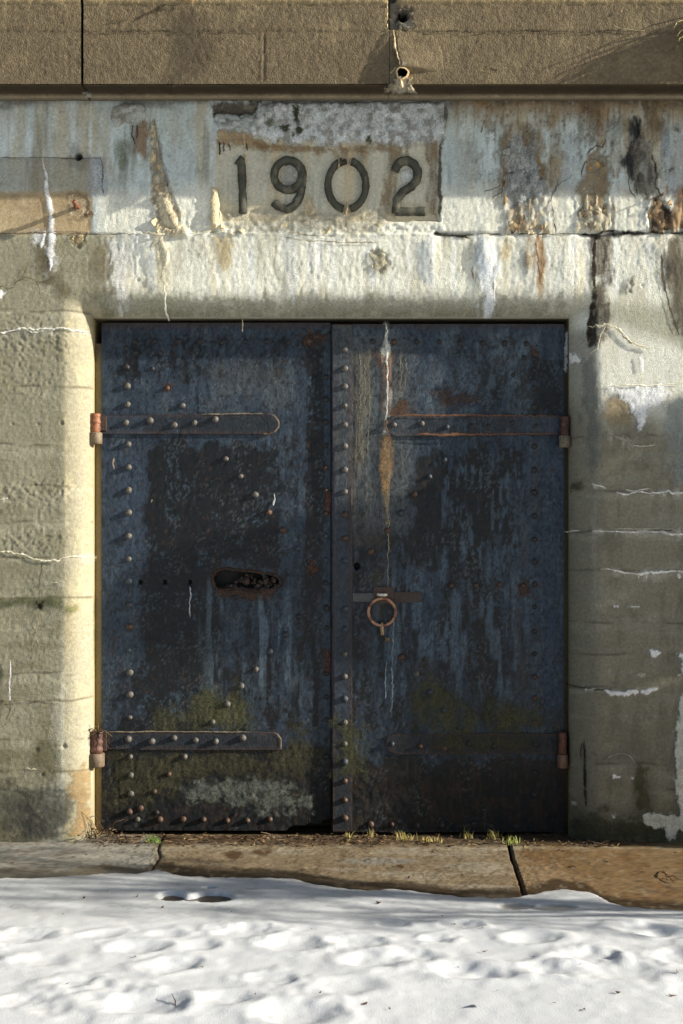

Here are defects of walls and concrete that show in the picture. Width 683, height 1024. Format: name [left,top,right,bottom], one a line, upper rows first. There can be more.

flaking render [213,101,445,148]
leakage [621,116,645,198]
leakage [32,158,70,298]
crack [0,327,90,335]
leakage [564,234,683,482]
rust [385,387,553,432]
crack [592,483,683,496]
crack [565,527,683,538]
crack [606,568,682,579]